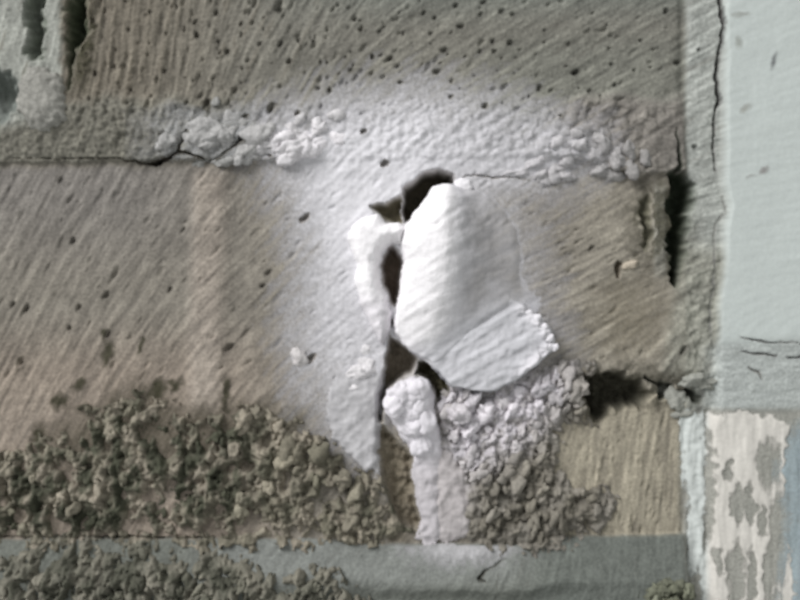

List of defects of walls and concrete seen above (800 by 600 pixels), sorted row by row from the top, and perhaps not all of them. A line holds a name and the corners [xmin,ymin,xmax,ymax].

spalling [0,66,21,127]
spalling [20,0,50,63]
spalling [60,0,94,95]
crack [0,129,245,167]
crack [711,0,729,174]
damp [260,85,597,564]
crack [707,195,729,346]
spalling [0,389,423,600]
spalling [431,299,796,600]